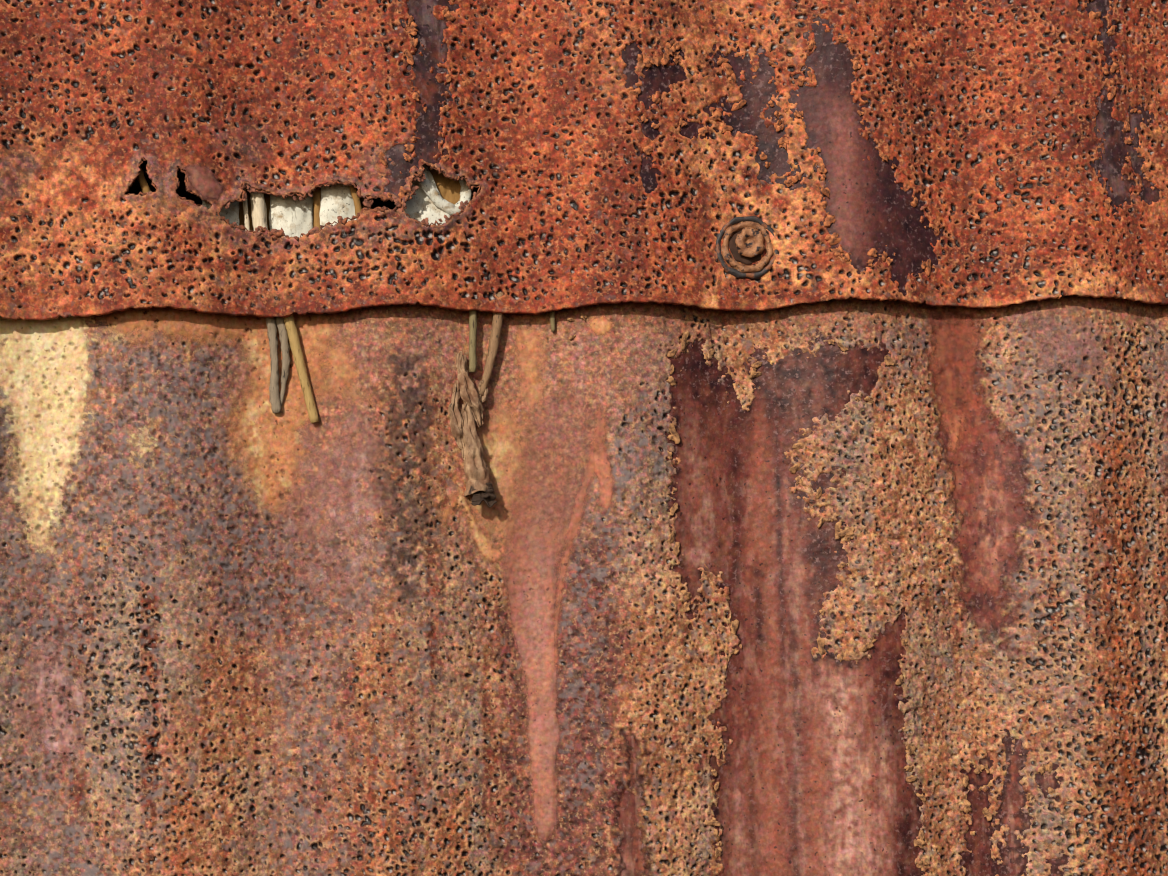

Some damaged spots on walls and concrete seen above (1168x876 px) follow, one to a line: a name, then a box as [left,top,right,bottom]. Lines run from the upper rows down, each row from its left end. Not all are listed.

corrosion [372,0,460,198]
peeling [421,192,478,226]
corrosion [619,37,687,200]
corrosion [675,9,945,295]
corrosion [1077,0,1163,221]
corrosion [103,307,362,507]
corrosion [590,317,612,335]
corrosion [925,312,1036,655]
corrosion [441,406,613,841]
corrosion [661,330,930,876]
corrosion [613,728,651,876]
corrosion [958,729,1036,876]